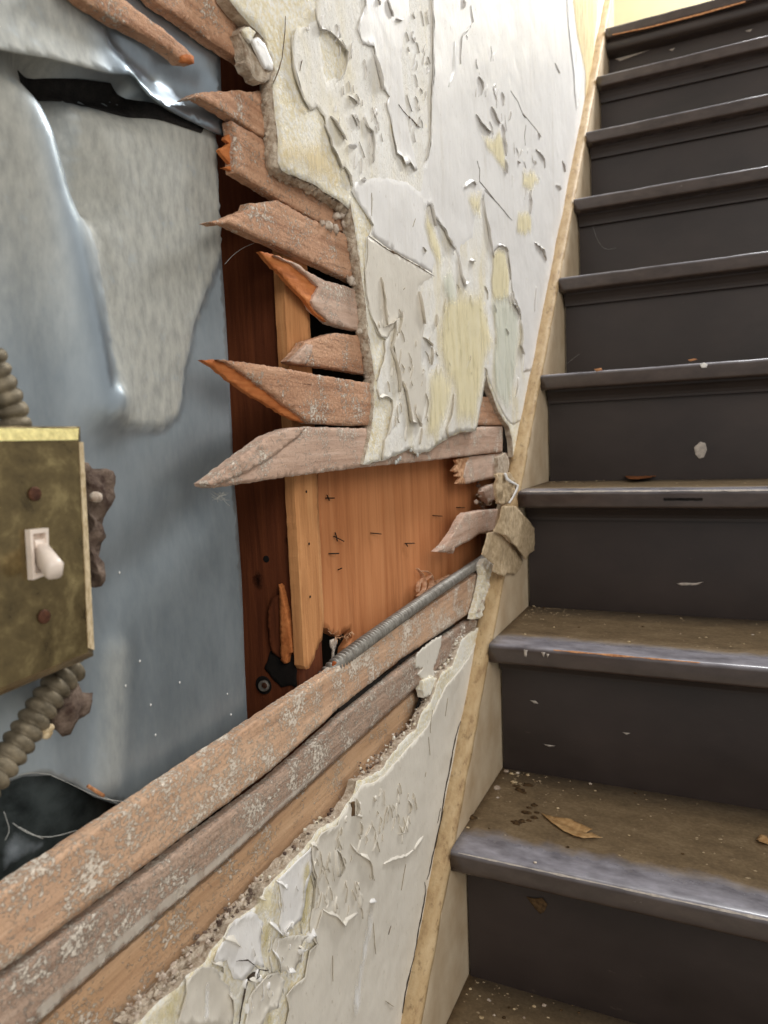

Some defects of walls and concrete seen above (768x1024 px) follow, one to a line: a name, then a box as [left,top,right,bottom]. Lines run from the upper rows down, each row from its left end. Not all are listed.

peeling [229,0,599,464]
flaking render [474,481,492,510]
peeling [114,558,494,1024]